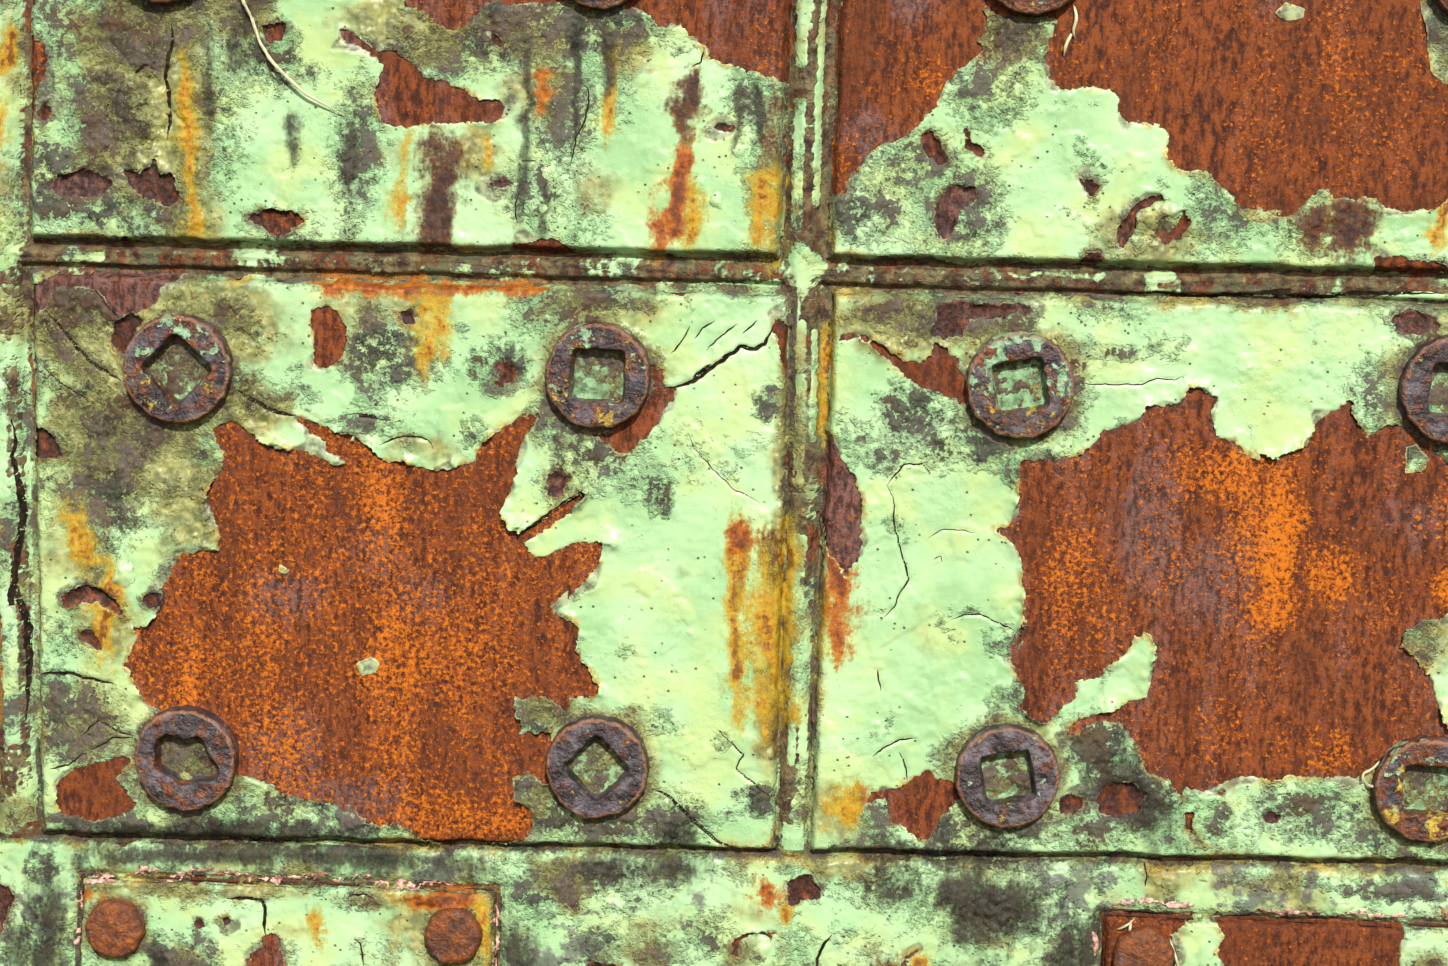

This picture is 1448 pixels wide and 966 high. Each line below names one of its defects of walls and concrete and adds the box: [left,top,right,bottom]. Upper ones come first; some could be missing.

leakage [286,114,300,162]
leakage [342,123,359,193]
corrosion [646,68,707,266]
peeling [830,0,1448,217]
crack [664,321,774,389]
crack [7,419,114,720]
peeling [124,412,602,843]
corrosion [723,513,801,757]
corrosion [817,546,866,669]
crack [880,463,974,622]
peeling [996,388,1448,796]
leakage [865,840,1100,966]